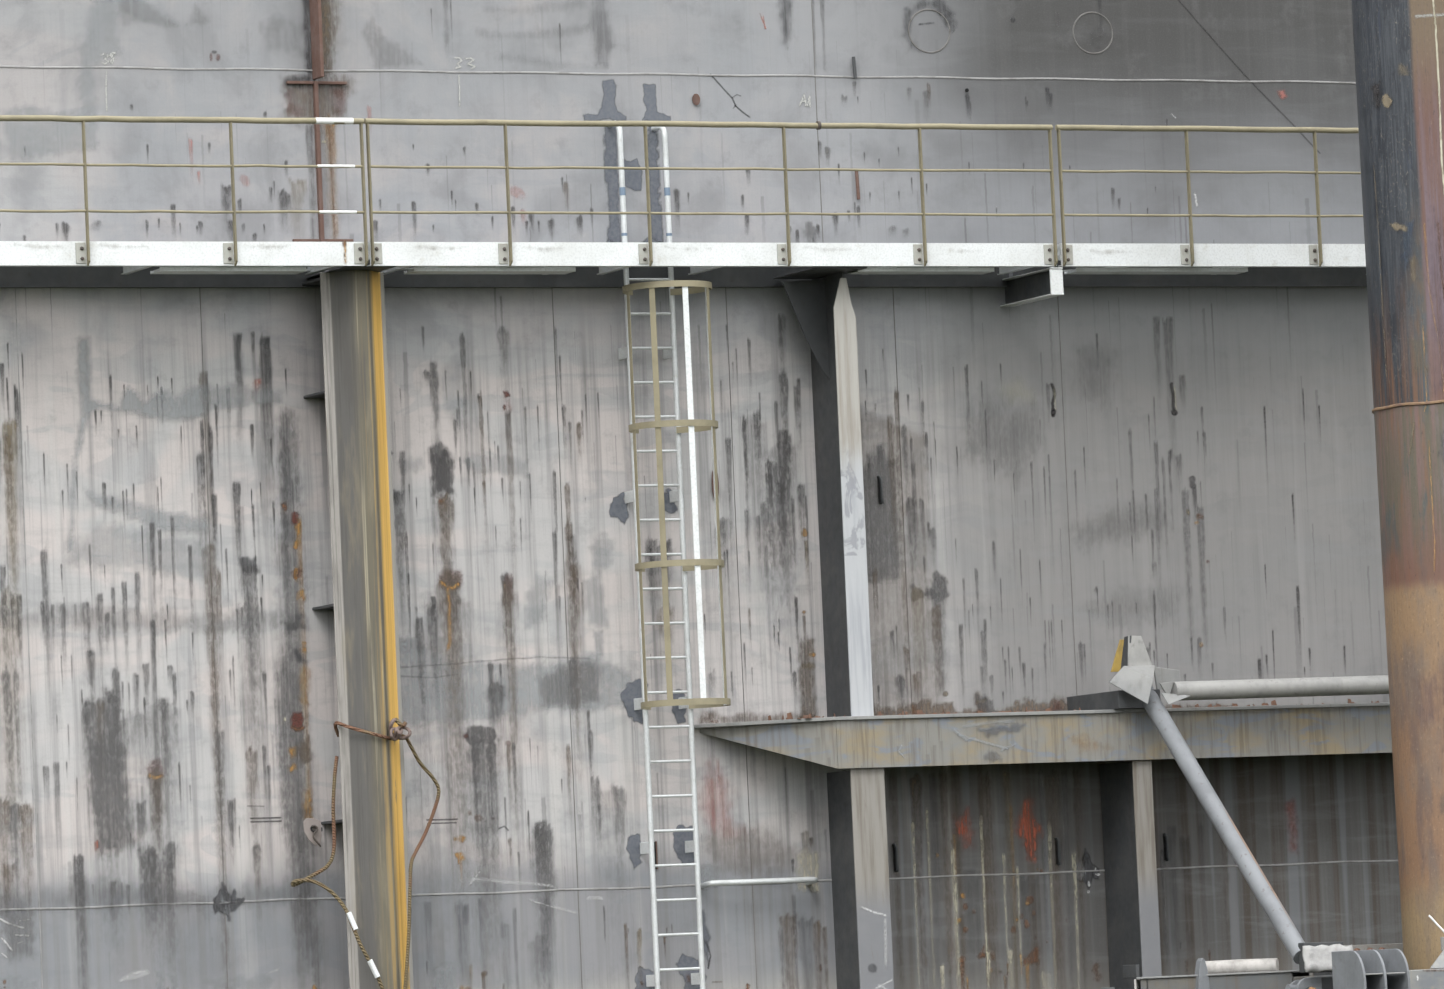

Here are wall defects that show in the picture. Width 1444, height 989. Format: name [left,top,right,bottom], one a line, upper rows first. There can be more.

rust [1432,0,1444,186]
damp [235,334,287,383]
damp [0,344,23,585]
damp [43,650,175,897]
damp [83,573,194,720]
damp [212,483,261,532]
damp [218,552,263,612]
rust [278,415,314,948]
rust [416,572,461,676]
damp [725,374,807,537]
damp [863,392,928,585]
rust [873,692,1068,716]